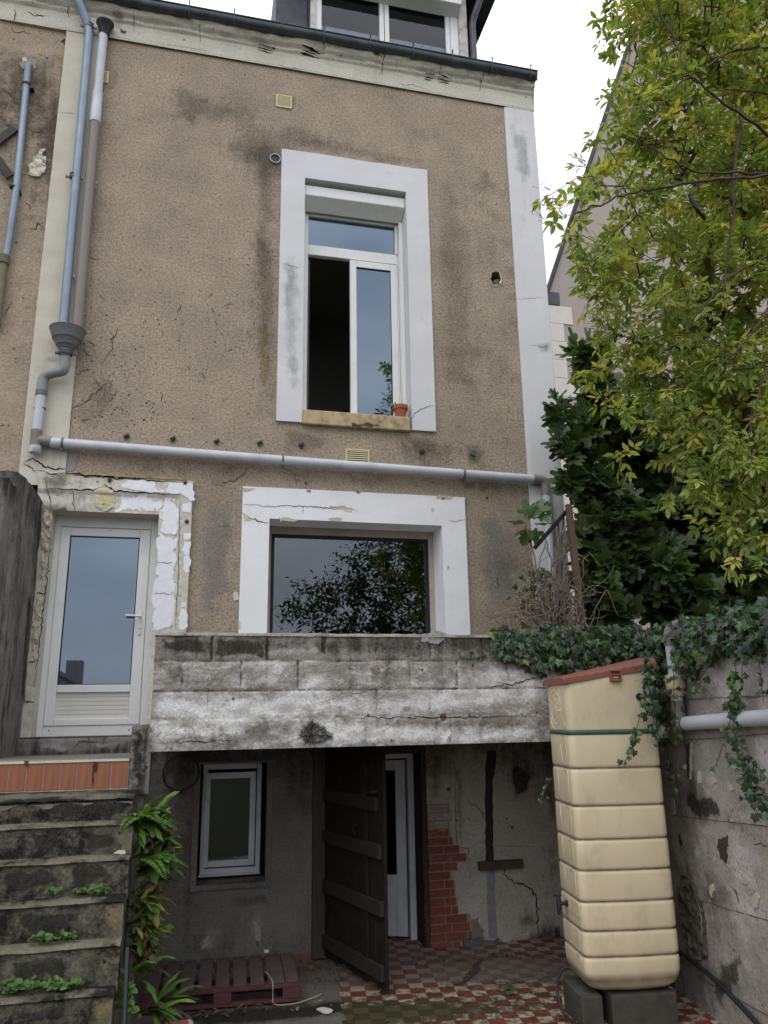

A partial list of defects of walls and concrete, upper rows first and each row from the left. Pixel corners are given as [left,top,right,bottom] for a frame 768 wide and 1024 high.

crack [222,466,357,523]
spalling [40,509,51,580]
peeling [114,479,195,631]
leakage [274,703,333,744]
crack [297,685,537,745]
flaking render [415,771,484,948]
crack [497,845,542,938]
spalling [717,835,729,864]